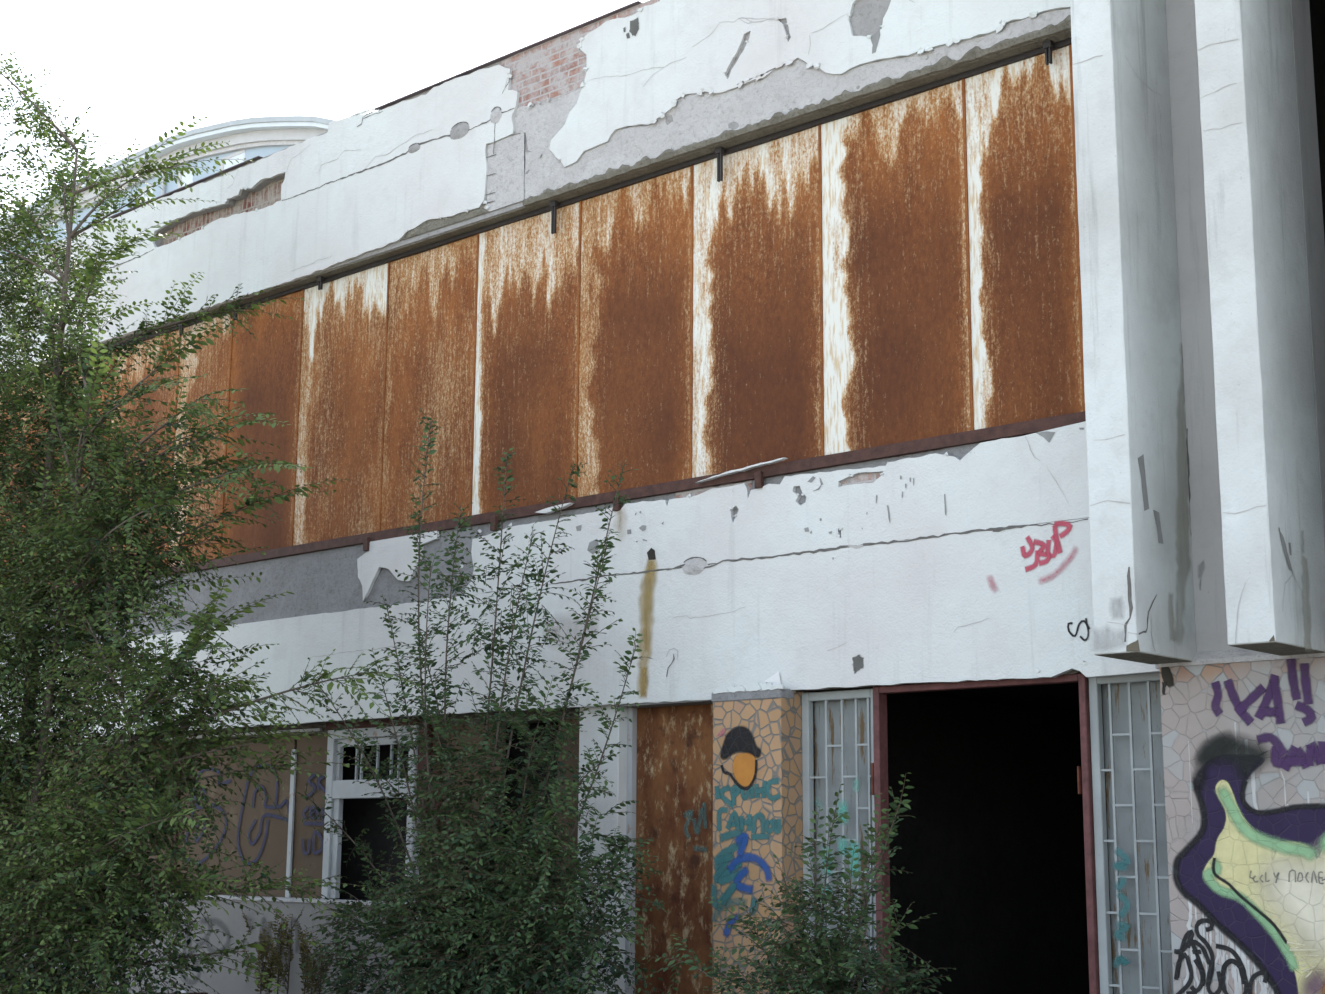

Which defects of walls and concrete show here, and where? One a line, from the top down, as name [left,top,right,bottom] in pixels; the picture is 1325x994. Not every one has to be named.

crack [282,68,514,201]
spalling [501,0,1071,210]
rust [0,46,1083,581]
flaking render [96,525,482,641]
flaking render [500,503,613,554]
rust [640,562,656,696]
crack [552,436,1130,584]